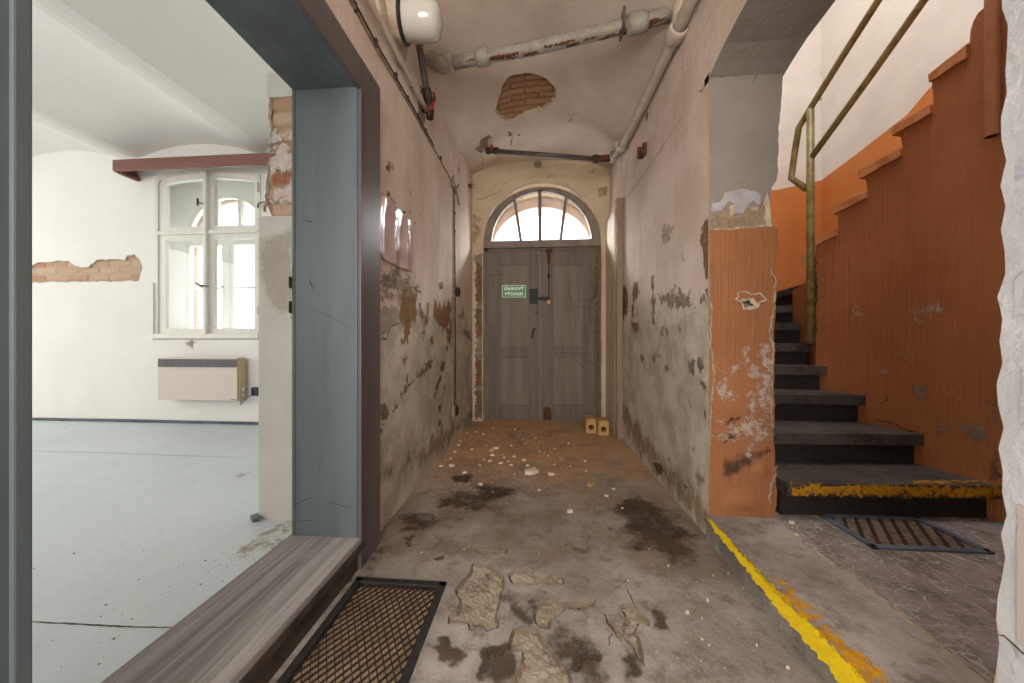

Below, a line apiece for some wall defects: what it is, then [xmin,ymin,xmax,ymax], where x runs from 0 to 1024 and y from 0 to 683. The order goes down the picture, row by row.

spalling [495,73,556,136]
spalling [263,97,292,216]
spalling [32,254,142,283]
spalling [657,188,777,465]
leakage [399,474,514,532]
leakage [608,404,706,563]
leakage [431,636,466,667]
leakage [476,642,517,682]
spalling [447,563,565,632]
spalling [508,599,596,683]
leakage [557,629,609,683]
leakage [651,610,668,629]